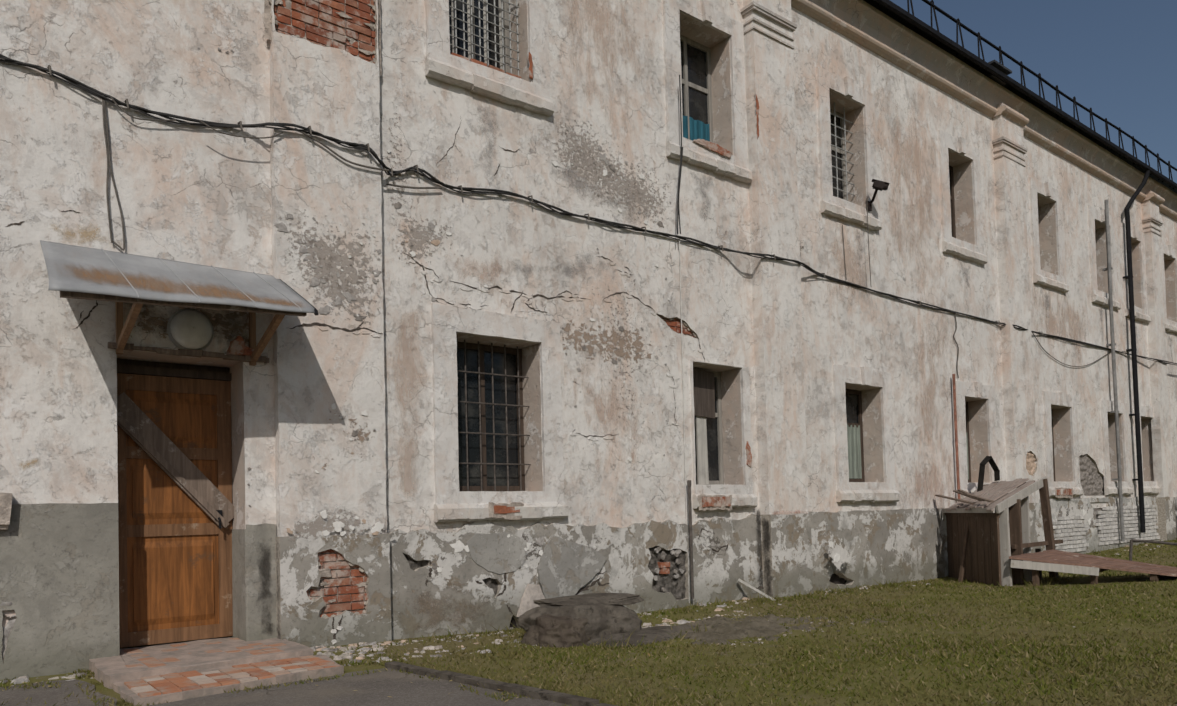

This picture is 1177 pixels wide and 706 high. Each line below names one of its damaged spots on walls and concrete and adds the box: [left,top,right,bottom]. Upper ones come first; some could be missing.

flaking render [264,0,382,76]
flaking render [274,107,463,329]
flaking render [546,110,677,231]
rust [76,270,297,306]
crack [401,250,656,316]
flaking render [557,279,667,462]
flaking render [656,313,699,339]
flaking render [1052,454,1160,552]
flaking render [286,504,395,619]
flaking render [648,546,689,600]